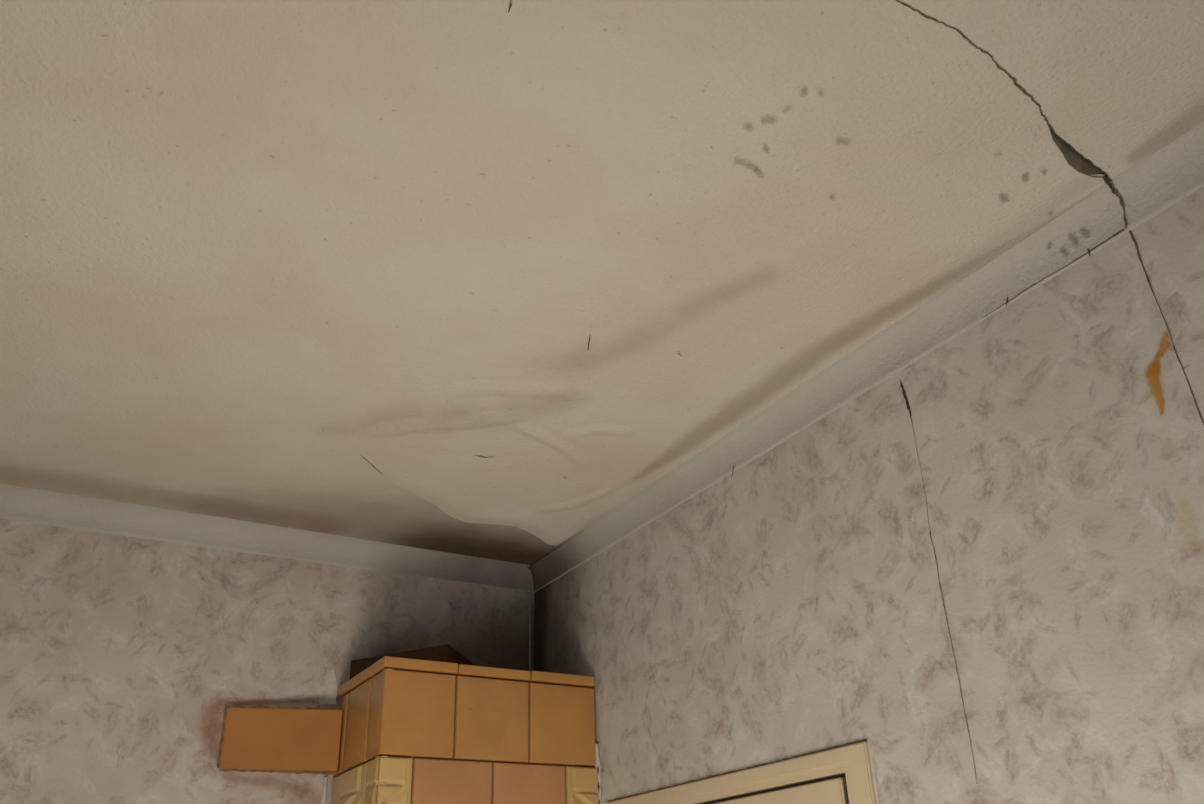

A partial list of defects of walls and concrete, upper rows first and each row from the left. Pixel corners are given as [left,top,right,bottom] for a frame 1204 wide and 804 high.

crack [896,0,1204,425]
crack [900,380,977,783]